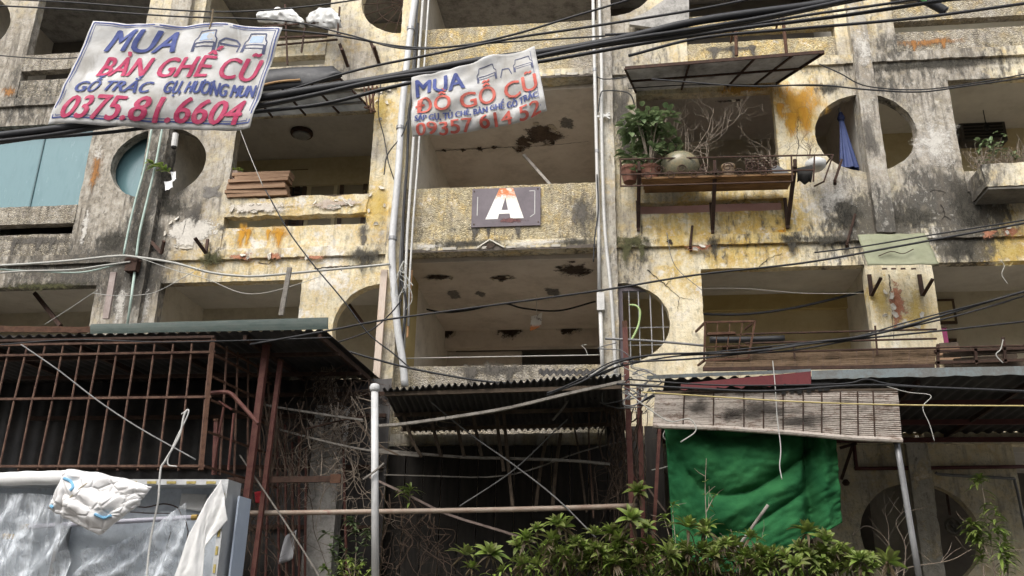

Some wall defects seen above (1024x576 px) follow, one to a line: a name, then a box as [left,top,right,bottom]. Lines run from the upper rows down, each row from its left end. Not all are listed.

rust [903,38,962,51]
water stain [722,84,839,134]
rust [90,157,101,187]
rust [237,225,251,246]
rust [266,227,284,247]
spalling [222,185,385,225]
water stain [781,187,863,253]
flaking render [882,281,924,329]